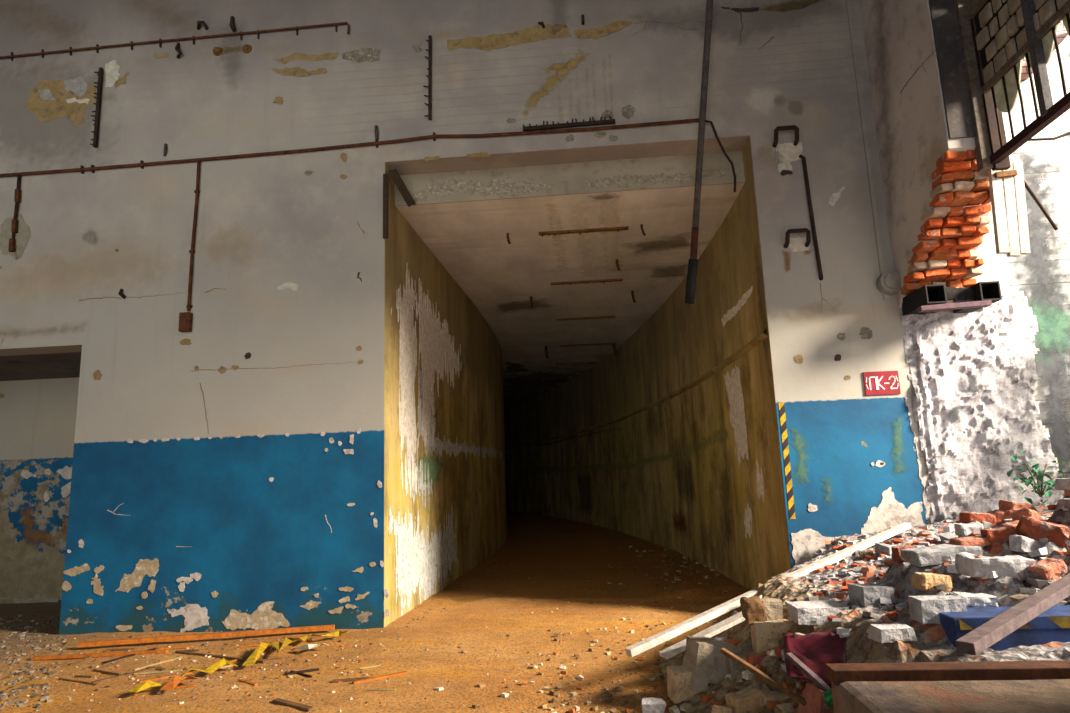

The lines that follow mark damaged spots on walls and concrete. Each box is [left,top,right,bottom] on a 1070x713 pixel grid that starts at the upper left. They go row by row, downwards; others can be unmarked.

peeling [447,20,632,51]
spalling [412,35,432,120]
flaking render [23,60,129,148]
flaking render [789,150,1063,565]
peeling [321,428,361,454]
peeling [352,264,502,617]
peeling [21,466,72,502]
peeling [0,505,159,610]
peeling [176,572,202,592]
peeling [167,591,218,633]
peeling [222,601,290,631]
peeling [300,586,370,614]